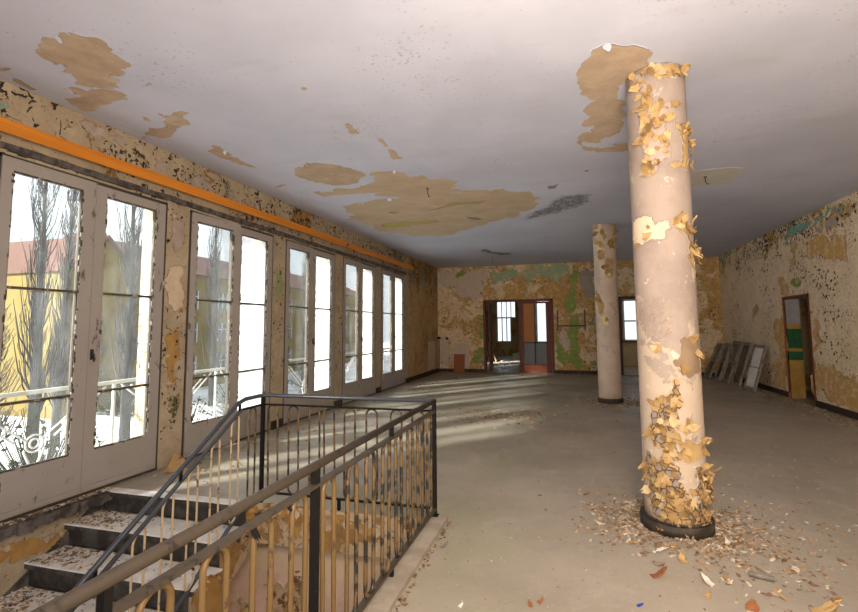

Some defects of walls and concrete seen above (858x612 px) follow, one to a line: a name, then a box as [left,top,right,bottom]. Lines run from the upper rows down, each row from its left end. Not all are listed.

peeling [32,31,133,112]
peeling [141,110,192,139]
peeling [575,43,697,179]
peeling [292,136,542,236]
mould [530,195,586,218]
peeling [633,210,703,274]
peeling [427,314,484,371]
peeling [554,224,618,370]
peeling [736,203,858,413]
peeling [638,321,715,540]
peeling [191,572,257,612]
peeling [263,571,308,612]